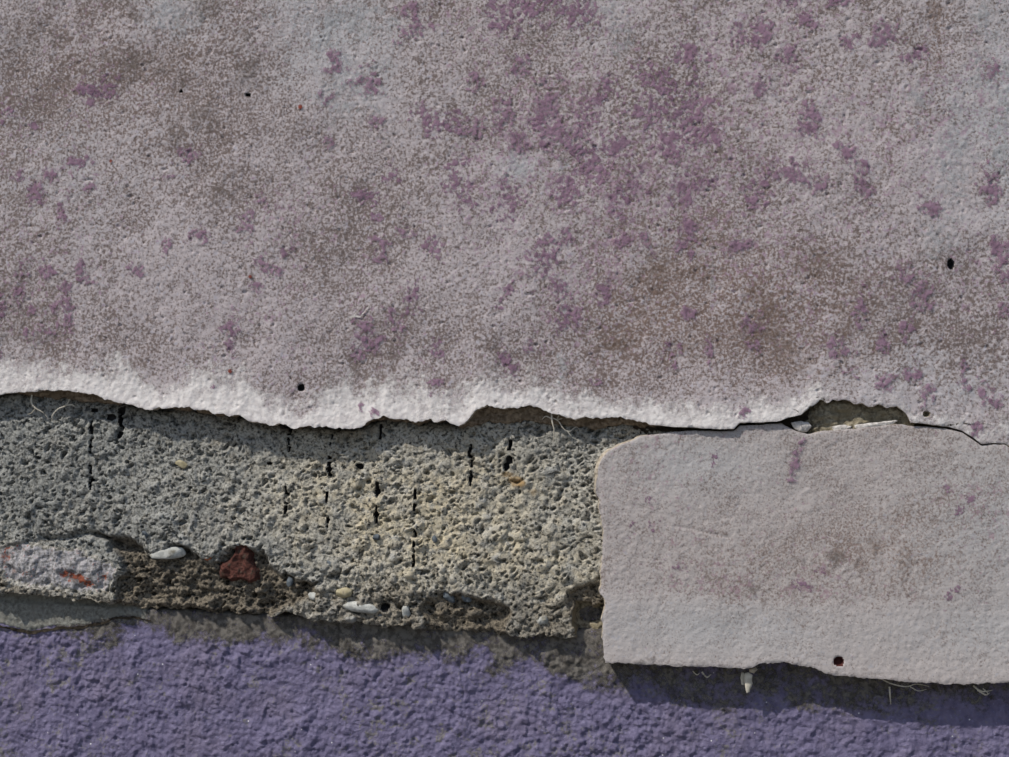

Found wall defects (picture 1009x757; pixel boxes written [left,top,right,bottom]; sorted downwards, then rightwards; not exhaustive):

peeling [184,225,211,245]
peeling [0,257,98,342]
peeling [494,227,588,336]
crack [632,397,825,439]
spalling [733,359,1009,482]
crack [914,423,1002,445]
spalling [0,390,1009,720]